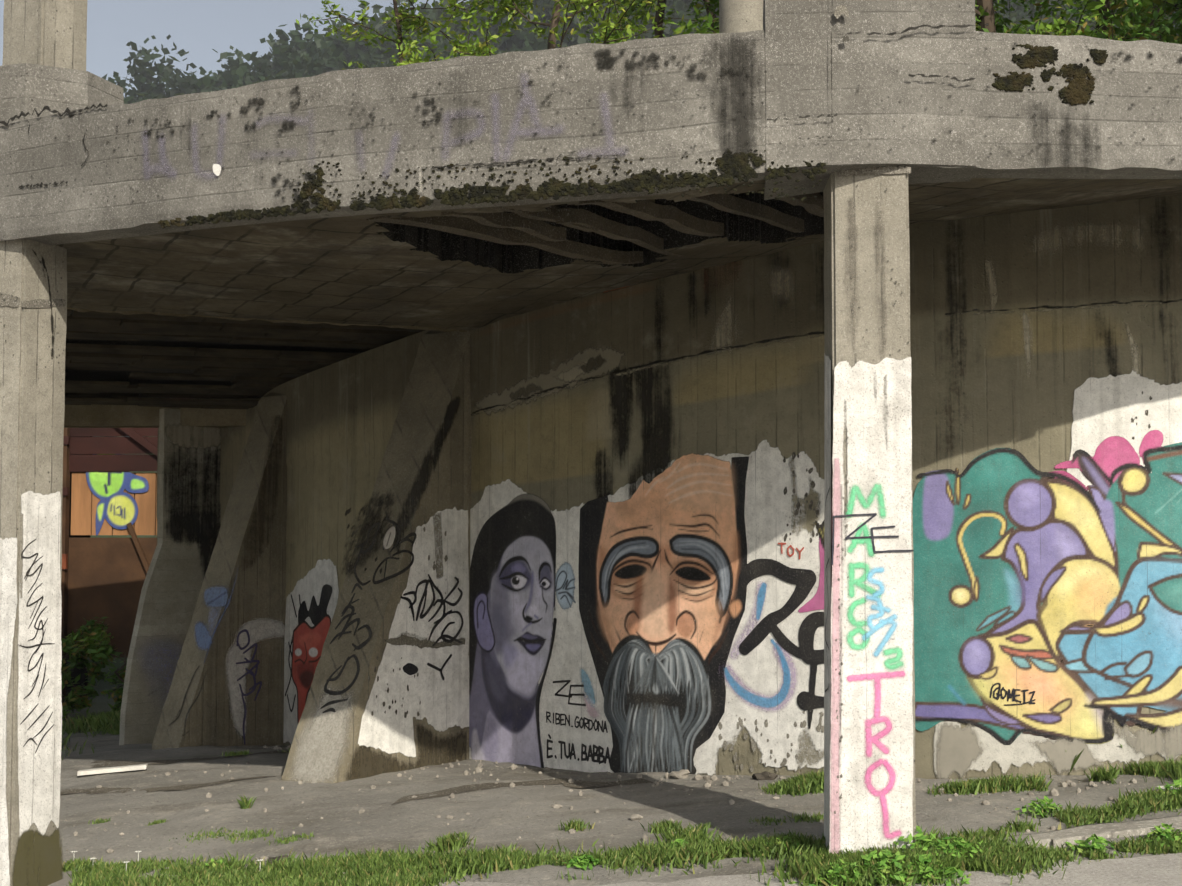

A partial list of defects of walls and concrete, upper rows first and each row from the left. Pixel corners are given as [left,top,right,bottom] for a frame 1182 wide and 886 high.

crack [0,103,107,188]
water stain [710,36,756,170]
crack [767,0,989,140]
spalling [375,192,824,274]
crack [945,299,1182,315]
spalling [475,347,625,415]
water stain [595,299,671,498]
crack [471,331,824,415]
water stain [165,424,221,577]